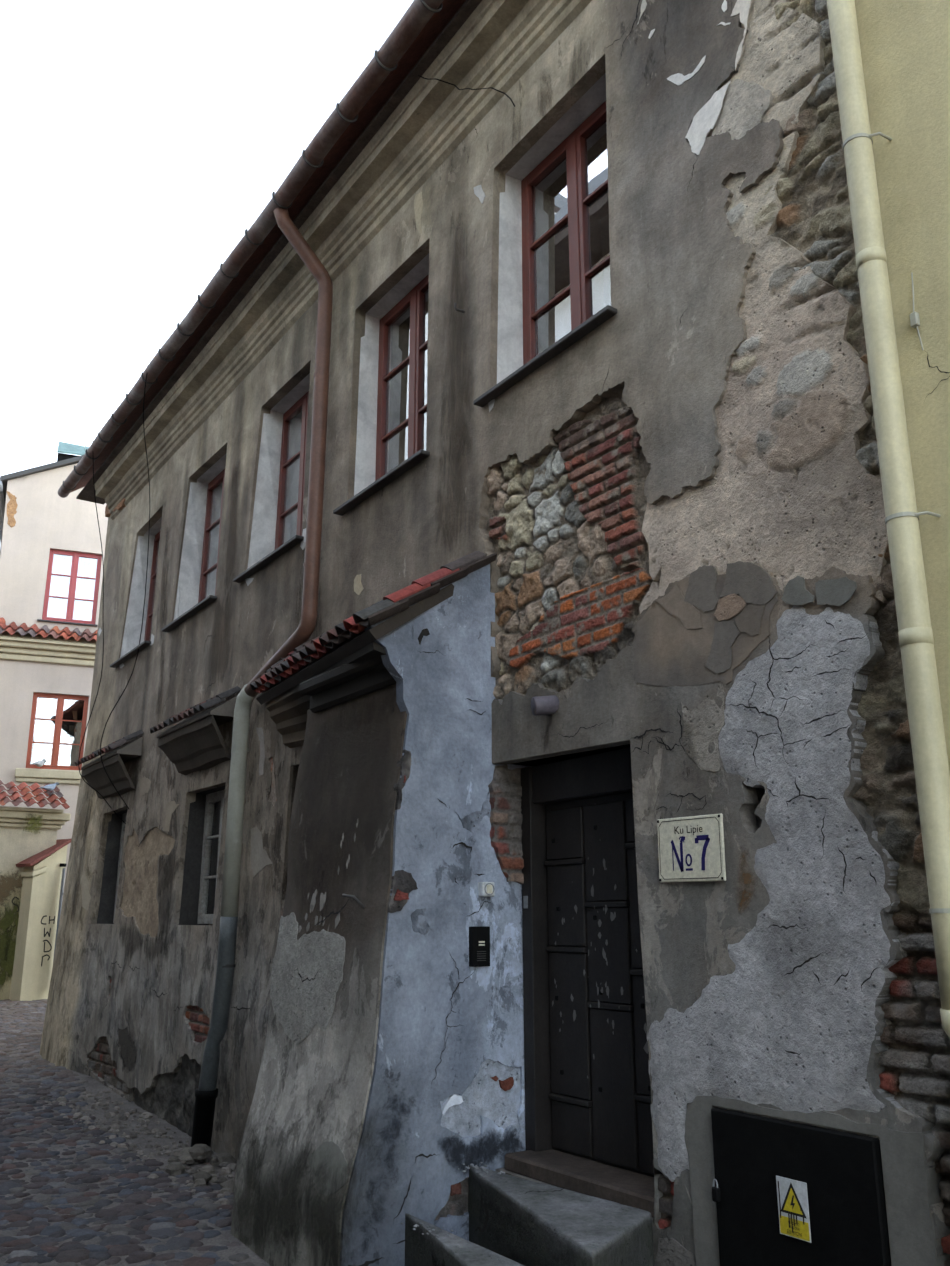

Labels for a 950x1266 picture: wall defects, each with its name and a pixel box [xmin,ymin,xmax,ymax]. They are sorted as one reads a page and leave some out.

crack [418,75,515,107]
spalling [7,491,18,528]
spalling [486,0,950,1266]
crack [722,620,876,895]
crack [768,924,877,989]
flaking render [185,1005,210,1043]
spalling [87,1036,201,1137]
water stain [360,1095,413,1171]
water stain [234,1125,383,1266]